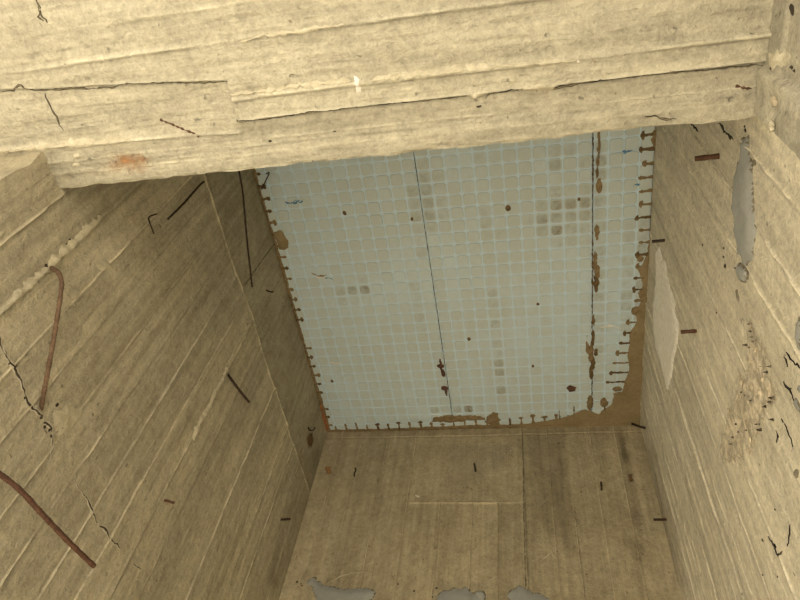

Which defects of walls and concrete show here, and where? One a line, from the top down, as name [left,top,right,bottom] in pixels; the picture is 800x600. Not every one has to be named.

crack [2,81,228,131]
corrosion [410,151,454,424]
crack [0,335,58,462]
crack [75,479,142,571]